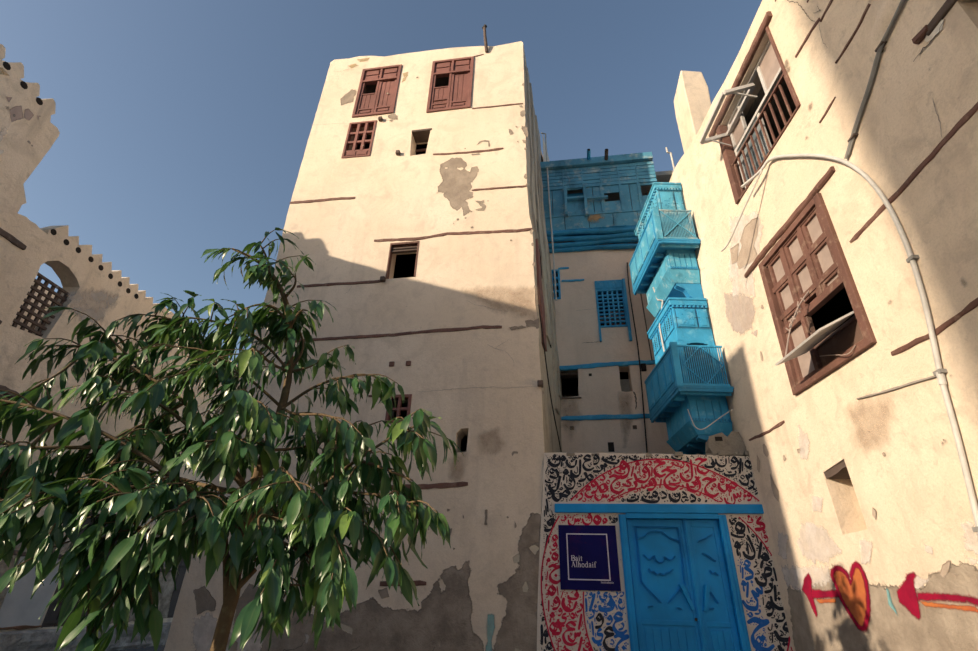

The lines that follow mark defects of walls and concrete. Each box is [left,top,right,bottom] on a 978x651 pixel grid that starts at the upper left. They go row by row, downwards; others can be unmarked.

spalling [437,140,490,228]
flaking render [261,513,541,651]
flaking render [787,561,978,651]